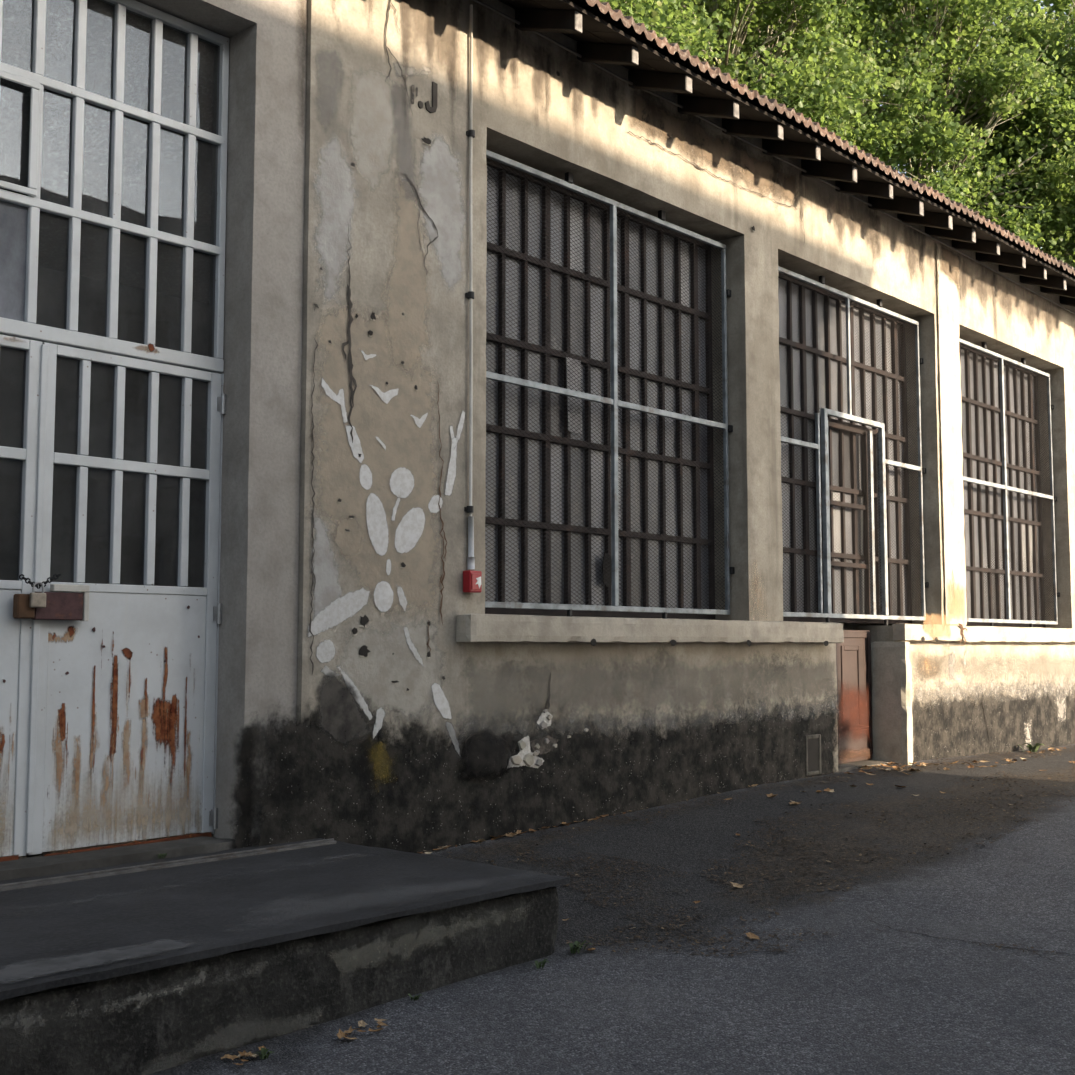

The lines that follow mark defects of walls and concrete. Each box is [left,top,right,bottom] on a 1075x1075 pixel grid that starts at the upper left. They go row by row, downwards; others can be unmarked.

crack [385,0,413,114]
leakage [402,0,458,92]
peeling [315,71,395,299]
crack [403,173,438,275]
crack [309,224,357,674]
peeling [312,309,439,618]
rust [48,626,75,642]
rust [44,632,211,856]
leakage [231,663,840,854]
spalling [509,709,571,768]
rust [837,688,870,738]
leakage [912,653,1075,762]